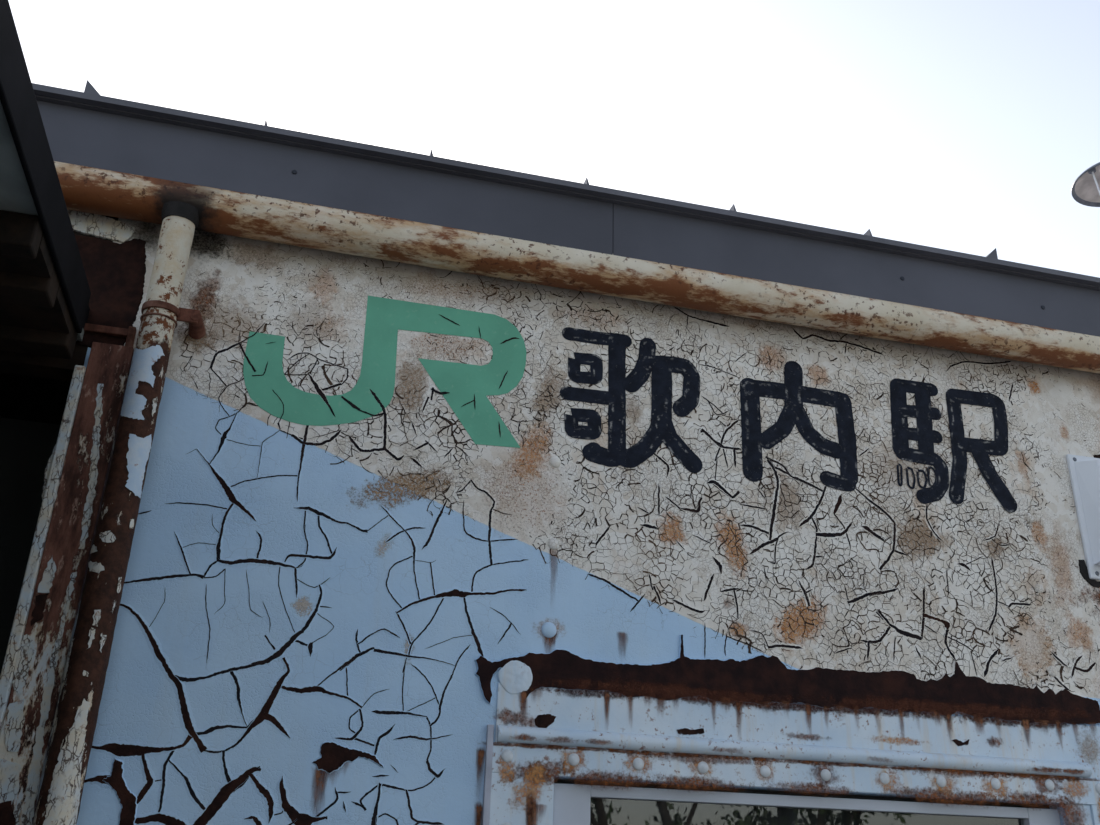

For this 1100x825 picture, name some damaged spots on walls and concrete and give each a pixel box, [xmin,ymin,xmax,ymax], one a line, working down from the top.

corrosion [191,230,230,258]
peeling [68,210,165,420]
corrosion [189,271,220,322]
peeling [125,434,152,498]
crack [84,241,1100,825]
corrosion [773,599,825,650]
peeling [0,572,90,825]
peeling [474,635,1100,728]
peeling [102,758,138,825]
corrosion [314,769,327,806]
peeling [312,741,384,774]
corrosion [477,679,1099,825]